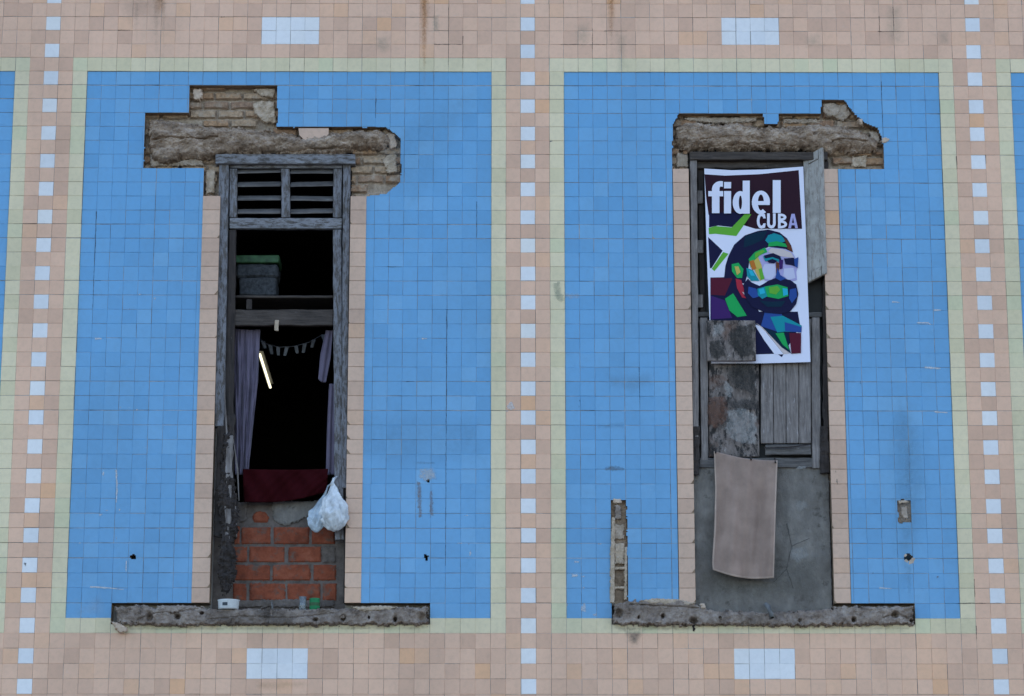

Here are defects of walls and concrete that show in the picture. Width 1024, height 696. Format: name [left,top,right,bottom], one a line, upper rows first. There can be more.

flaking render [143,85,402,196]
flaking render [672,100,890,170]
peeling [897,499,911,524]
peeling [609,498,628,607]
spalling [111,603,193,634]
spalling [850,603,915,625]